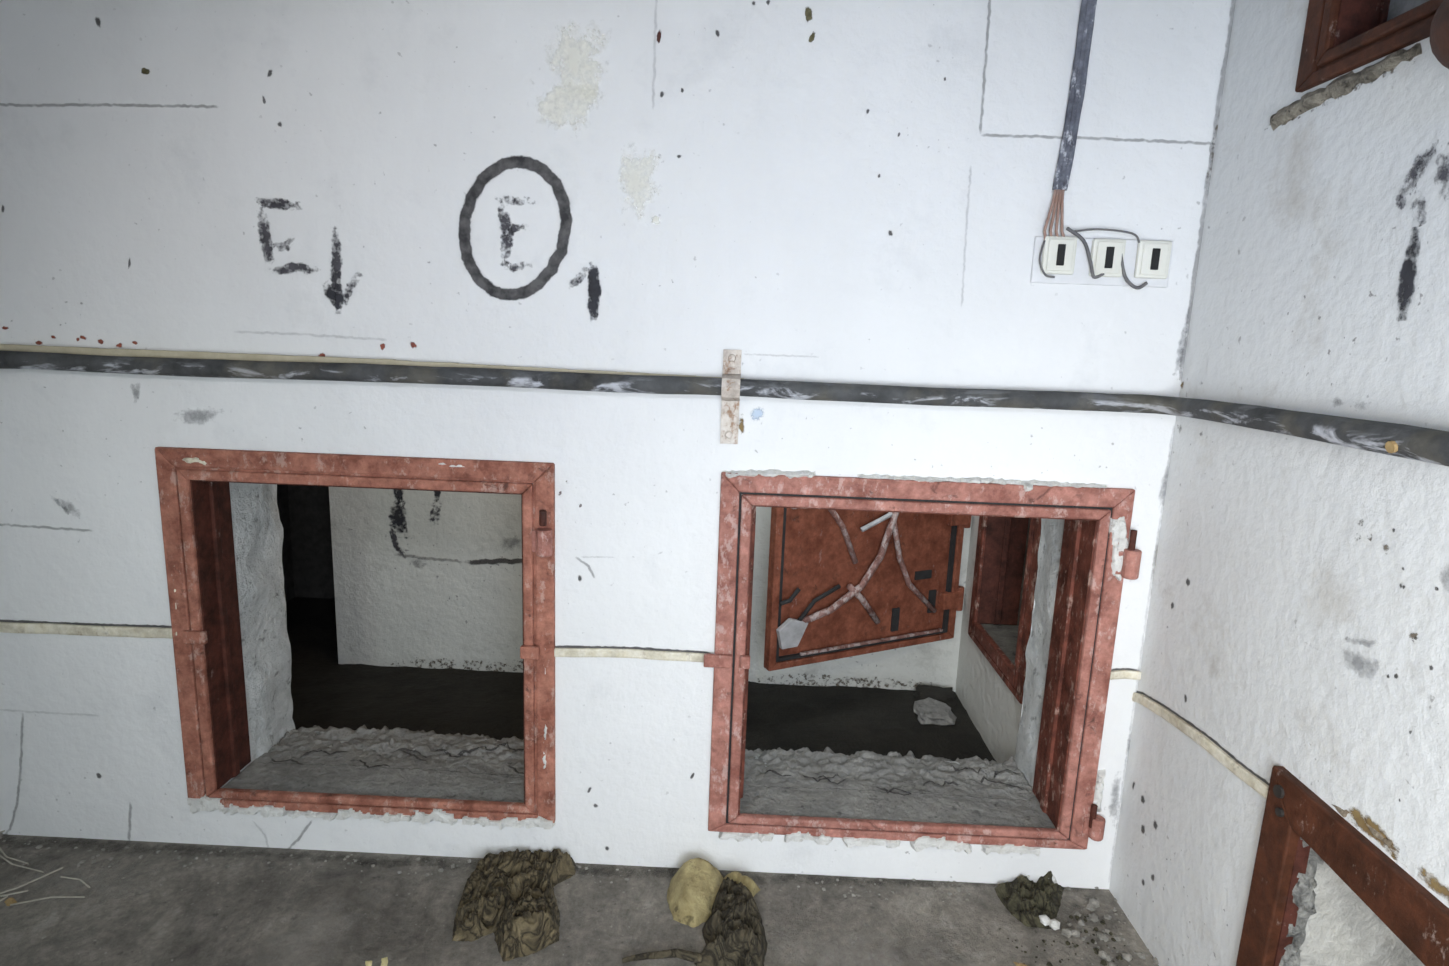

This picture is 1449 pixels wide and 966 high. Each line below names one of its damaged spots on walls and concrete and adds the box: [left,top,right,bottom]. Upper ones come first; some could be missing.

spalling [1331,804,1396,851]
spalling [1279,837,1324,966]